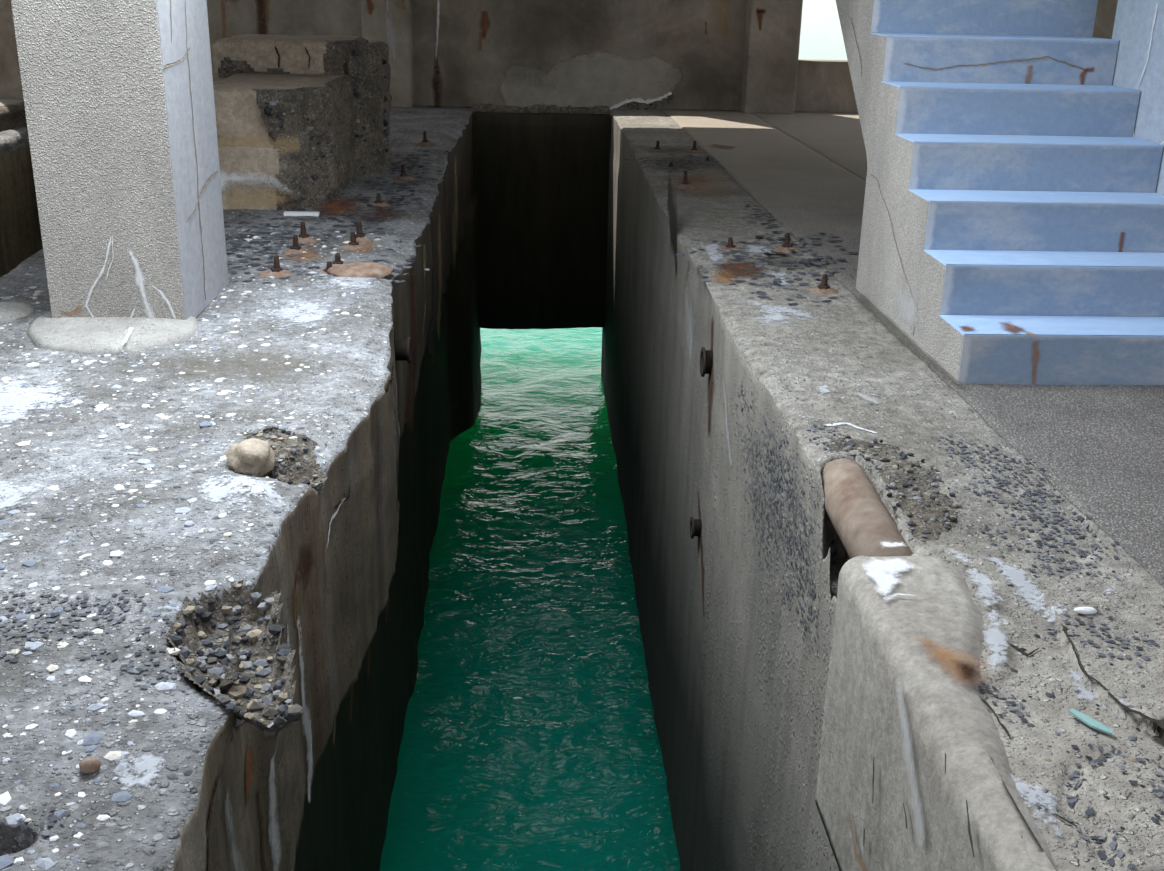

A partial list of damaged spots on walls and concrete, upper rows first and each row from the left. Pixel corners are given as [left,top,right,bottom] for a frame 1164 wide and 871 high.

rust [257,0,269,34]
spalling [471,51,682,114]
crack [163,0,218,300]
damp [122,251,176,345]
rust [1004,323,1039,385]
spalling [240,425,327,490]
spalling [0,580,304,737]
efflorescence [287,580,313,802]
rust [924,639,978,680]
crack [978,681,1030,739]
crack [1024,624,1164,871]
efflorescence [269,739,280,871]